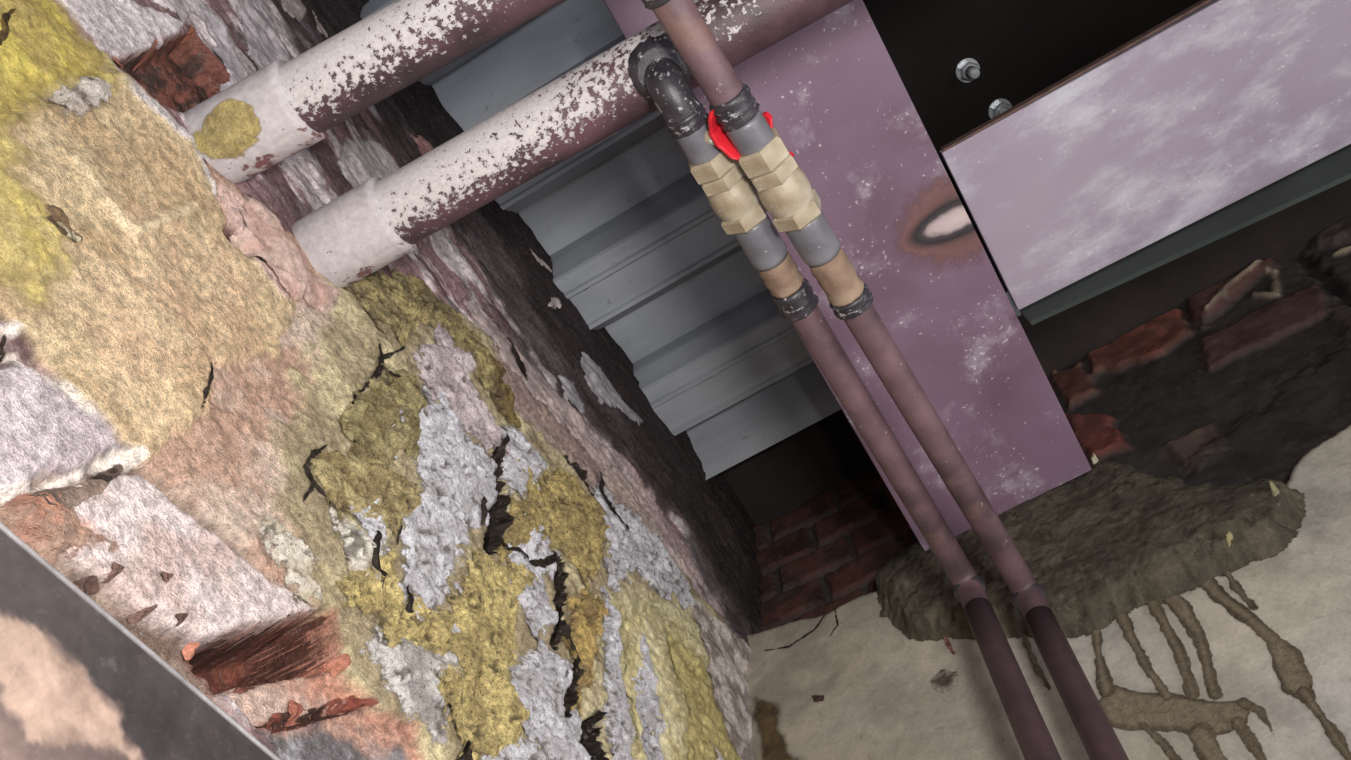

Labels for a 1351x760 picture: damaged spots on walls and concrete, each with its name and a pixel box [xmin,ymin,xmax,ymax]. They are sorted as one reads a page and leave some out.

spalling [113,0,328,113]
crack [350,343,405,407]
peeling [466,301,643,471]
spalling [0,464,125,595]
crack [372,525,414,613]
crack [481,426,609,760]
crack [564,455,629,529]
spalling [182,614,351,695]
damp [1091,629,1116,697]
damp [1113,592,1273,760]
rust [754,700,797,760]
damp [1296,686,1351,760]